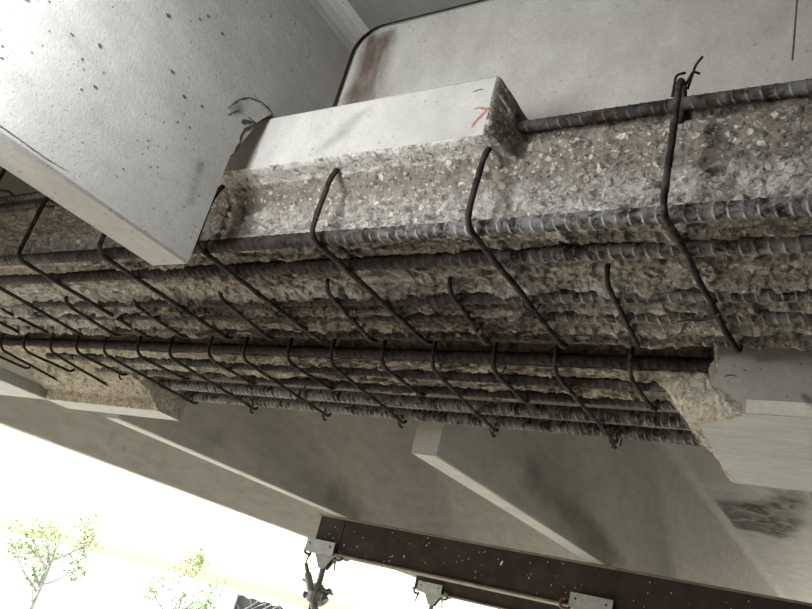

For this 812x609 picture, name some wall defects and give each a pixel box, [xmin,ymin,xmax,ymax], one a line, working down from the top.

crack [790,0,798,61]
crack [228,97,276,157]
spalling [200,76,812,241]
spalling [0,198,124,256]
spalling [0,215,812,483]
damp [723,497,799,537]